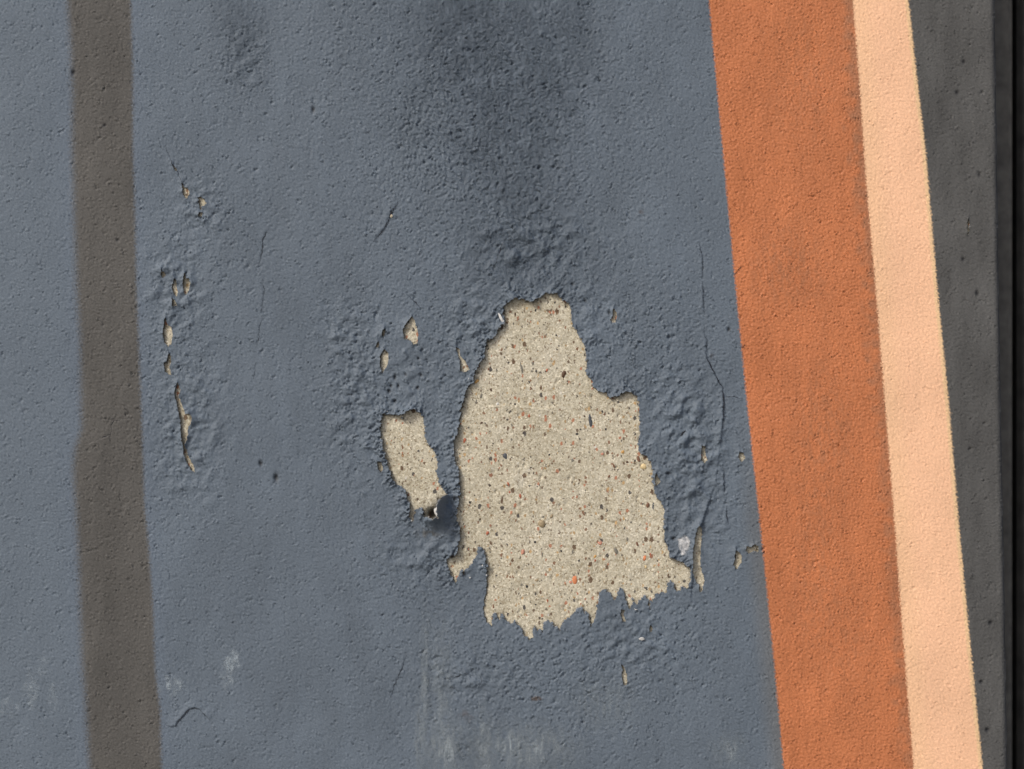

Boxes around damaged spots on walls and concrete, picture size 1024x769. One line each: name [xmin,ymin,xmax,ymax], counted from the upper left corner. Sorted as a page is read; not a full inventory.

peeling [160,270,190,307]
peeling [162,318,195,472]
peeling [375,292,705,642]